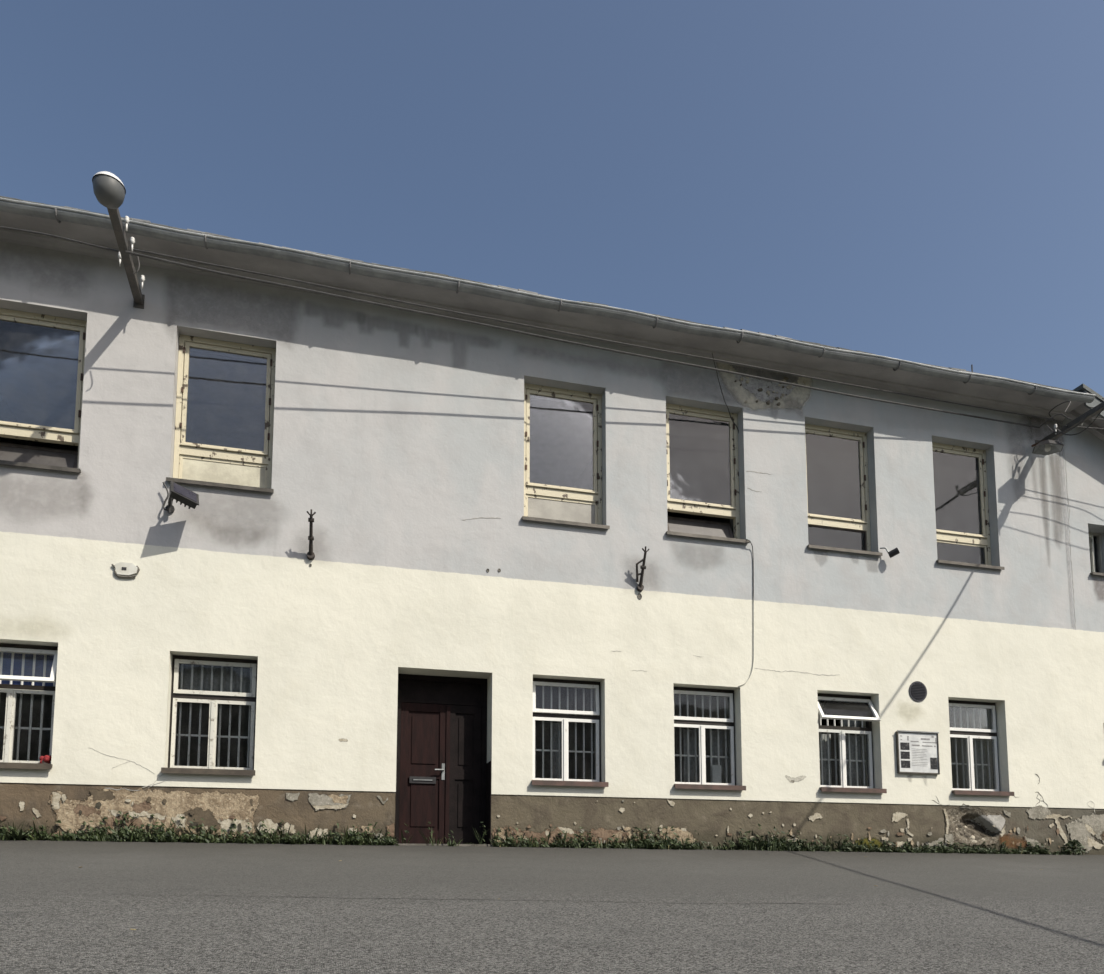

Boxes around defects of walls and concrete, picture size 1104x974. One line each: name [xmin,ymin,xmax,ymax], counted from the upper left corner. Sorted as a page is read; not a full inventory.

peeling [717,362,811,410]
peeling [19,787,395,840]
spalling [851,805,1104,852]